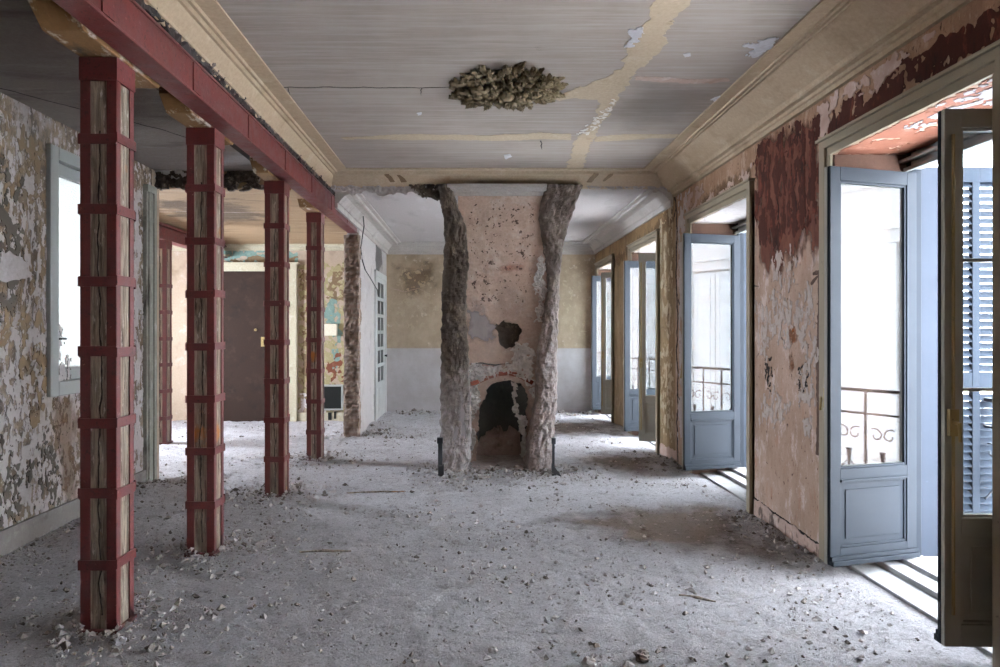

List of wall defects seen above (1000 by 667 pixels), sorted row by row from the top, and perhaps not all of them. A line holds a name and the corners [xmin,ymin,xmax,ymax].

peeling [341,0,730,168]
peeling [0,107,80,529]
flaking render [326,267,344,301]
flaking render [326,348,344,382]
flaking render [469,320,536,457]
peeling [659,6,1000,443]